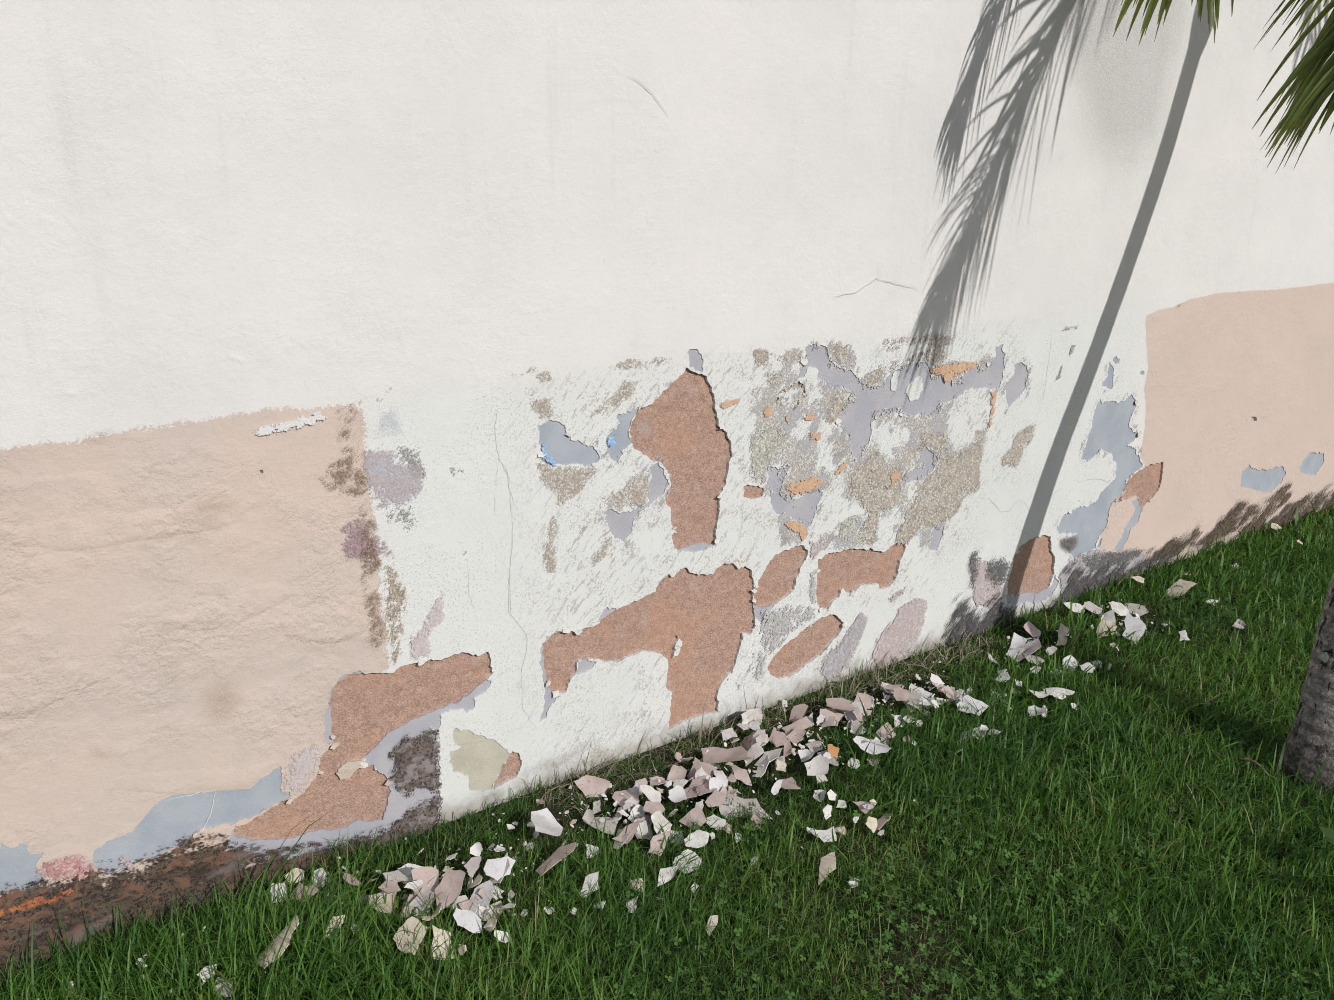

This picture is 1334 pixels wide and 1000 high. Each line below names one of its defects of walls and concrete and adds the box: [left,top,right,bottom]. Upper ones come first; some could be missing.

flaking render [533,337,1033,727]
leakage [944,550,1029,646]
peeling [1006,357,1162,606]
leakage [1054,482,1334,607]
peeling [1241,452,1324,493]
flaking render [92,652,492,874]
flaking render [493,751,521,788]
peeling [0,843,44,893]
leakage [0,729,444,984]